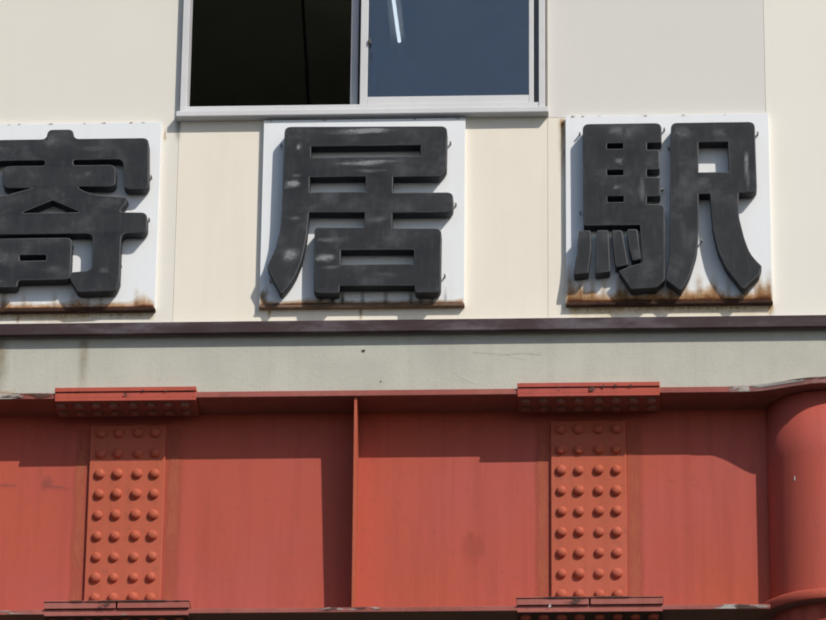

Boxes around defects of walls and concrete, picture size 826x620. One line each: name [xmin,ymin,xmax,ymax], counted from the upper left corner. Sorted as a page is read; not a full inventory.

rust [0,299,154,317]
rust [260,292,463,315]
rust [567,281,773,312]